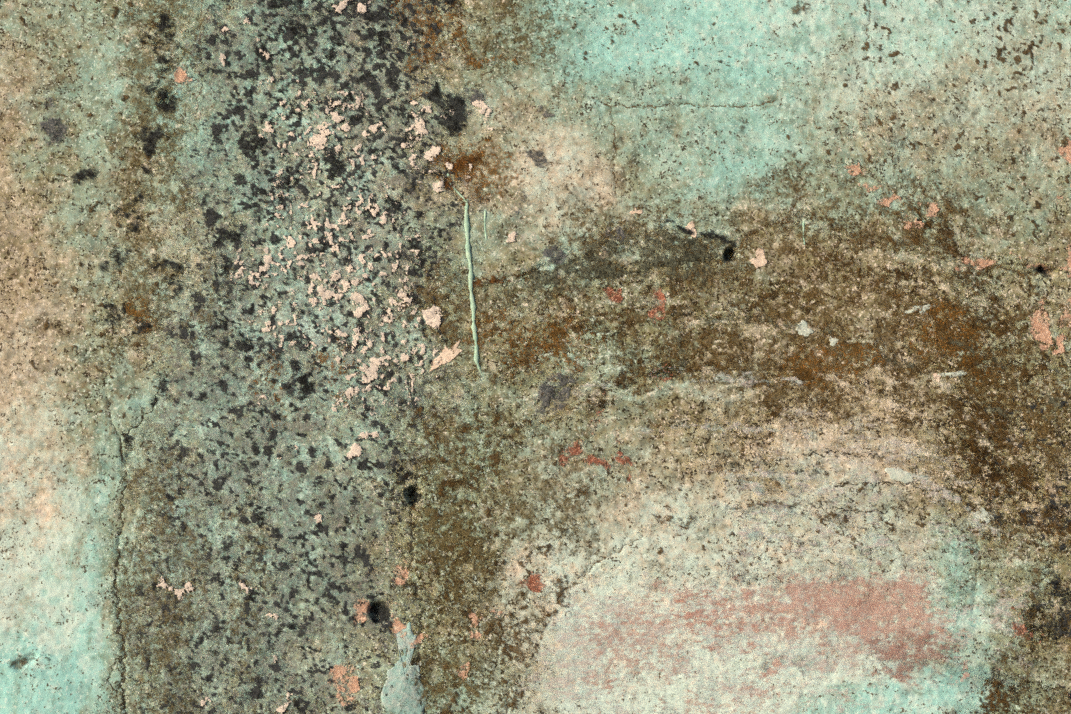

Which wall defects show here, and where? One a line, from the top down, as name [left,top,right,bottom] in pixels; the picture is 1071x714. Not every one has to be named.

rust [389,0,569,98]
damp [524,150,547,168]
flaking render [846,163,901,207]
flaking render [904,202,939,230]
flaking render [955,257,996,271]
flaking render [1030,297,1071,355]
peeling [429,340,463,372]
damp [149,370,184,413]
crack [106,380,160,714]
damp [915,565,1071,663]
damp [506,575,914,714]
damp [974,656,1071,714]